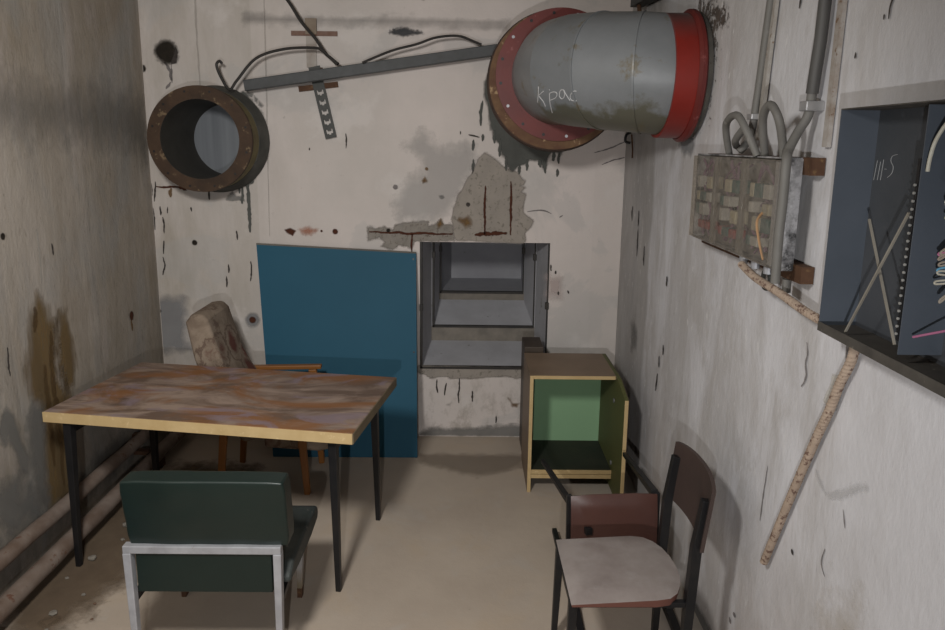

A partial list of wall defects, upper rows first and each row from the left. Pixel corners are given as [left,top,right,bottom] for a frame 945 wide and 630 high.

flaking render [367,153,533,252]